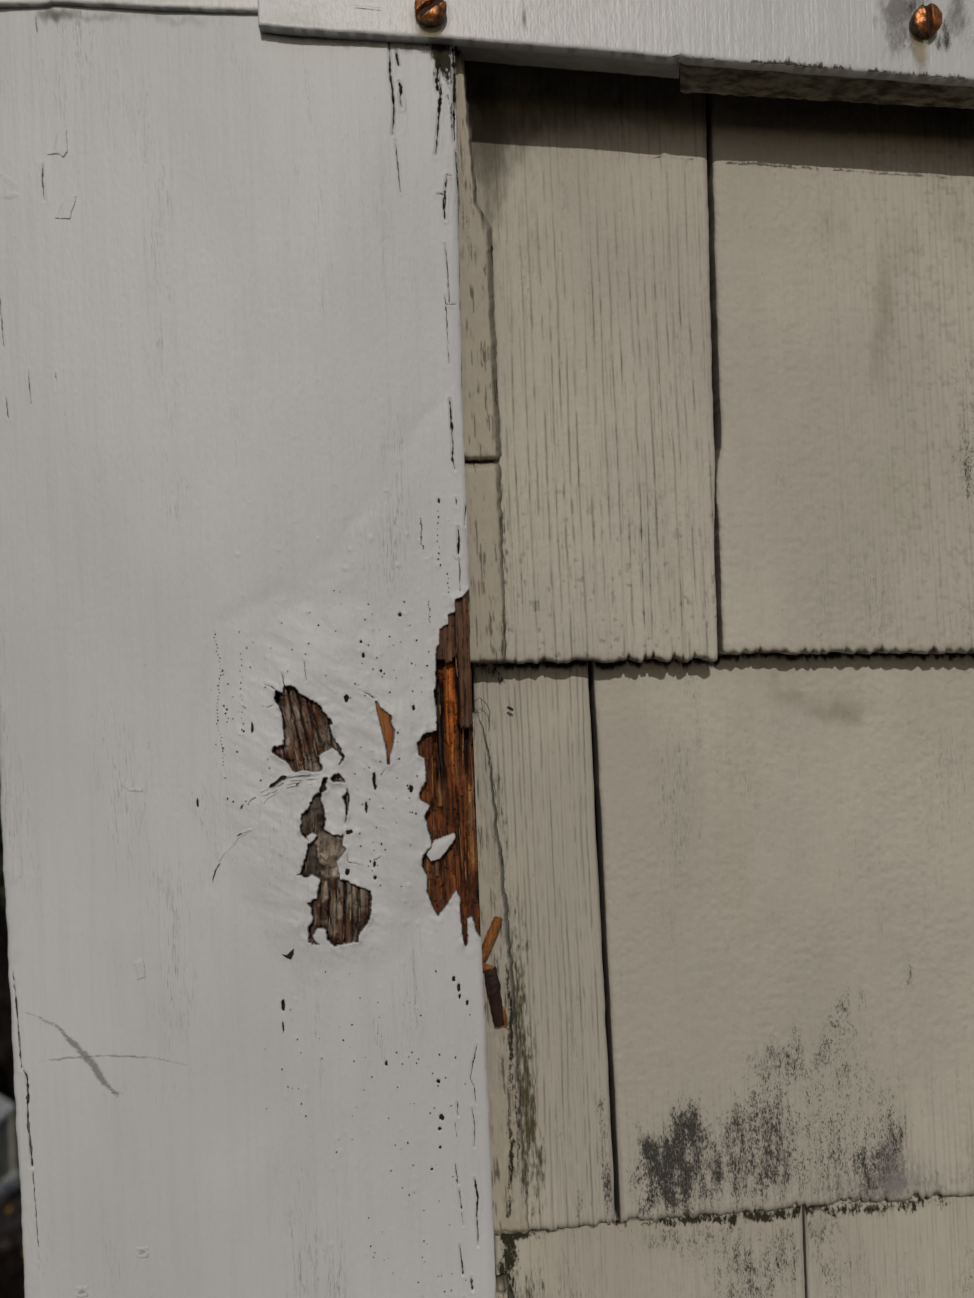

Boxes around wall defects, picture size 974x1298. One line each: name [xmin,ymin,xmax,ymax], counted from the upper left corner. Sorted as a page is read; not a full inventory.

leakage [885,0,924,48]
leakage [936,0,965,48]
crack [388,43,403,186]
crack [435,48,458,218]
crack [443,249,451,358]
crack [449,399,466,582]
peeling [376,701,395,764]
peeling [272,686,372,946]
leakage [630,993,910,1298]